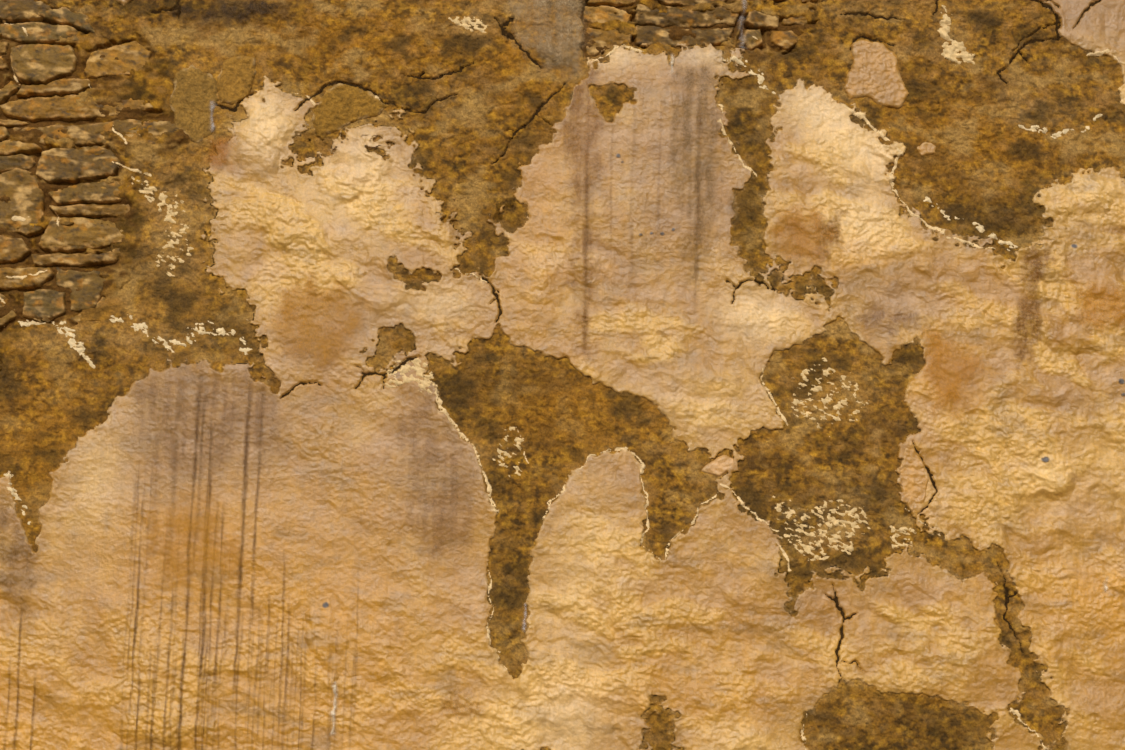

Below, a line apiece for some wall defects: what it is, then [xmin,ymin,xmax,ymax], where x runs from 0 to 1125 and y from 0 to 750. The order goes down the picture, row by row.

crack [997,0,1101,84]
spalling [0,0,1125,553]
water stain [4,471,31,525]
spalling [424,317,1070,750]
crack [825,584,863,681]